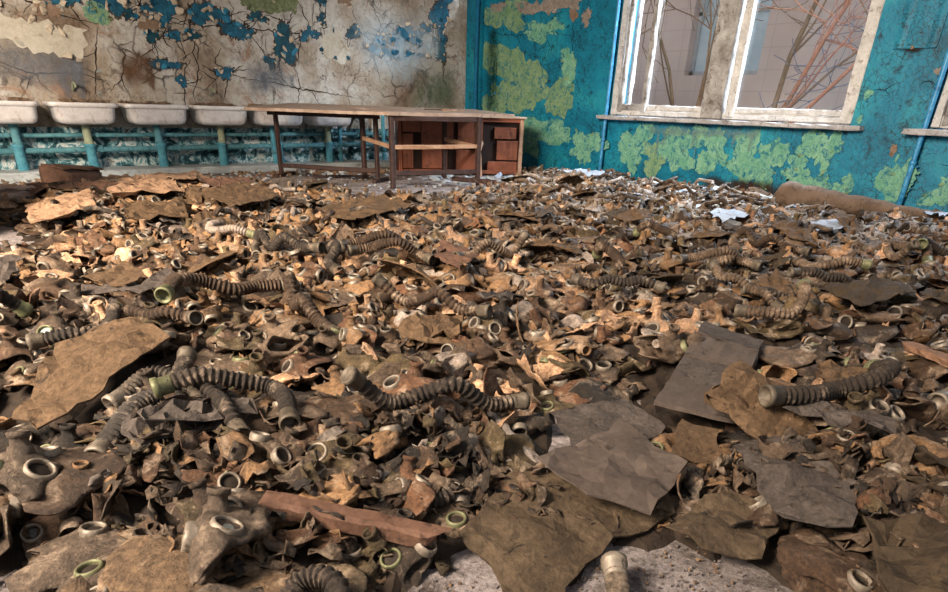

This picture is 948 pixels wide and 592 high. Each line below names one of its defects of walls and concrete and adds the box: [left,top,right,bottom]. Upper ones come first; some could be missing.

crack [1,0,361,103]
peeling [28,0,454,105]
flaking render [490,0,592,29]
flaking render [420,166,572,187]
flaking render [645,129,719,211]
flaking render [884,144,897,176]